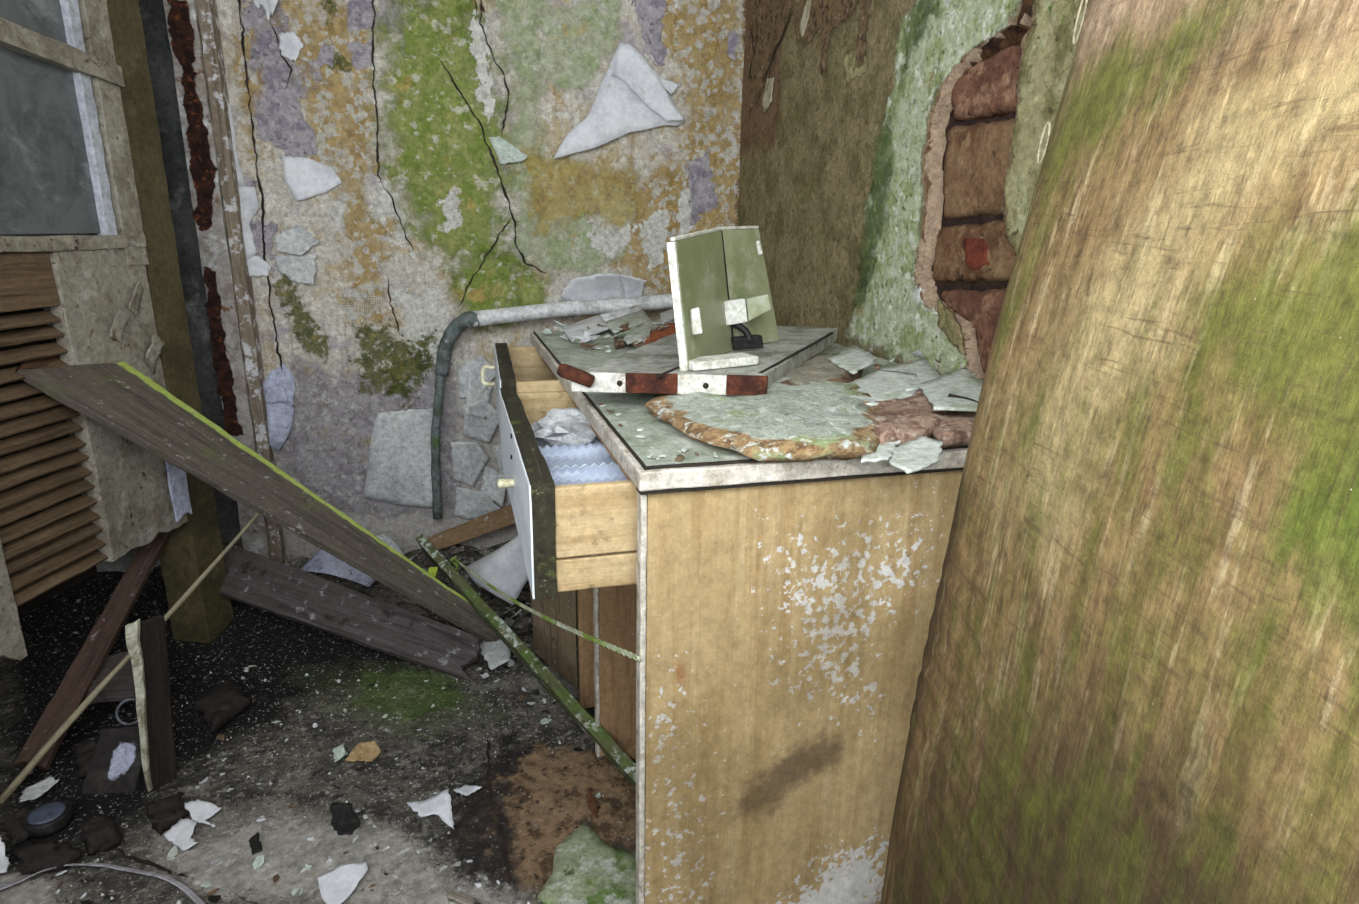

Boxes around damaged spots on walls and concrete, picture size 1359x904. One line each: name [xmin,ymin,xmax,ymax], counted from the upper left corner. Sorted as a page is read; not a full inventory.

rust [166,0,218,231]
crack [238,0,293,372]
flaking render [238,0,417,258]
crack [371,0,414,251]
crack [440,0,546,309]
peeling [553,0,721,159]
water stain [450,0,869,333]
water stain [855,123,893,307]
water stain [899,0,939,87]
flaking render [931,43,1022,374]
rust [203,267,244,436]
peeling [364,408,433,508]